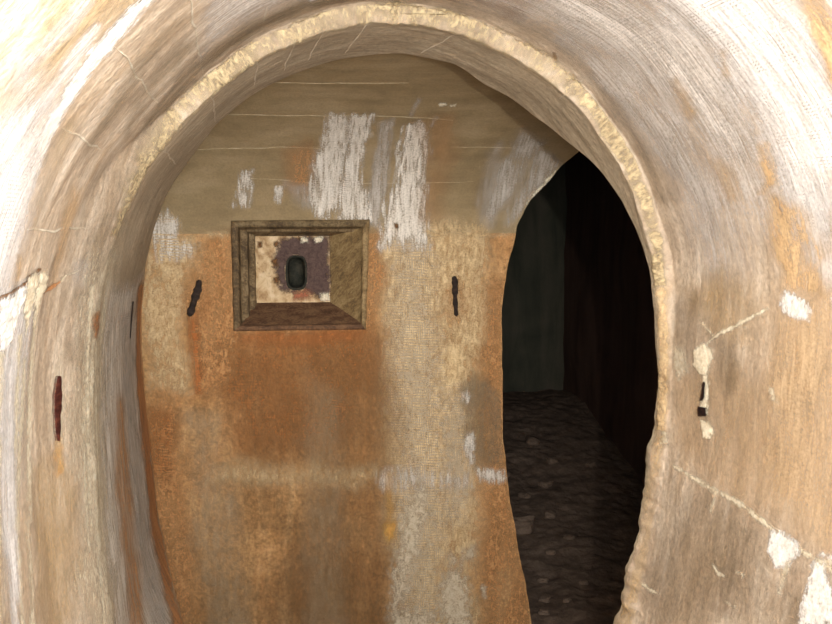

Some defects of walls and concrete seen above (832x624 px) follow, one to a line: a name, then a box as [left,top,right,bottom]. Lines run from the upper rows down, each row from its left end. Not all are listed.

damp [158,0,331,116]
damp [524,0,832,288]
damp [233,170,253,207]
spalling [112,2,713,479]
peeling [0,272,49,351]
rust [185,236,237,393]
crack [702,309,766,345]
damp [309,113,557,624]
rust [52,376,62,441]
crack [674,465,783,533]
crack [798,547,832,572]